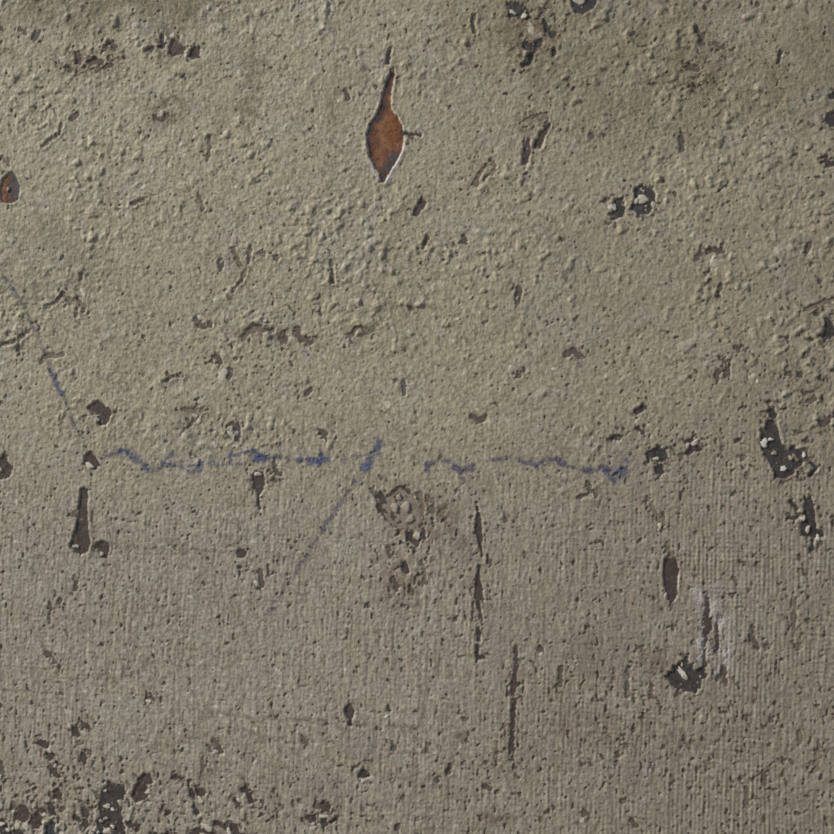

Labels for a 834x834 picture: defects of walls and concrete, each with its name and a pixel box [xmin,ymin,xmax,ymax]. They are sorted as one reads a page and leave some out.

peeling [760,408,818,479]
peeling [665,656,707,694]
crack [509,645,520,757]
peeling [37,740,62,778]
peeling [68,721,90,737]
peeling [212,738,224,754]
peeling [0,788,63,834]
peeling [171,774,241,834]
peeling [233,785,254,807]
peeling [306,801,338,830]